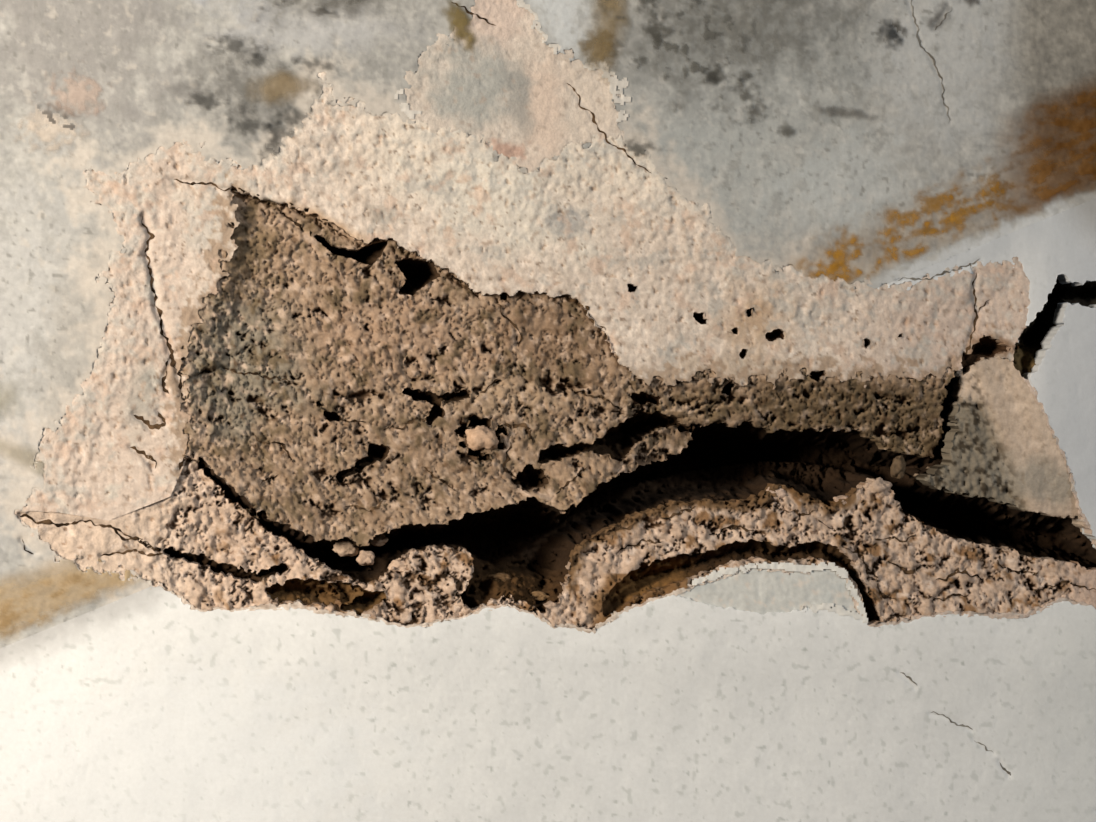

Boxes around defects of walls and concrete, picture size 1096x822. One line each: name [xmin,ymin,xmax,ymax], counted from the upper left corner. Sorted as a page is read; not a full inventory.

leakage [320,0,364,13]
leakage [448,5,474,48]
leakage [580,0,622,62]
leakage [640,0,804,81]
leakage [220,73,300,111]
leakage [827,107,864,116]
leakage [628,144,650,156]
rust [876,87,1096,269]
crack [175,179,523,347]
rust [811,236,863,282]
spalling [14,0,1096,634]
crack [20,216,1096,622]